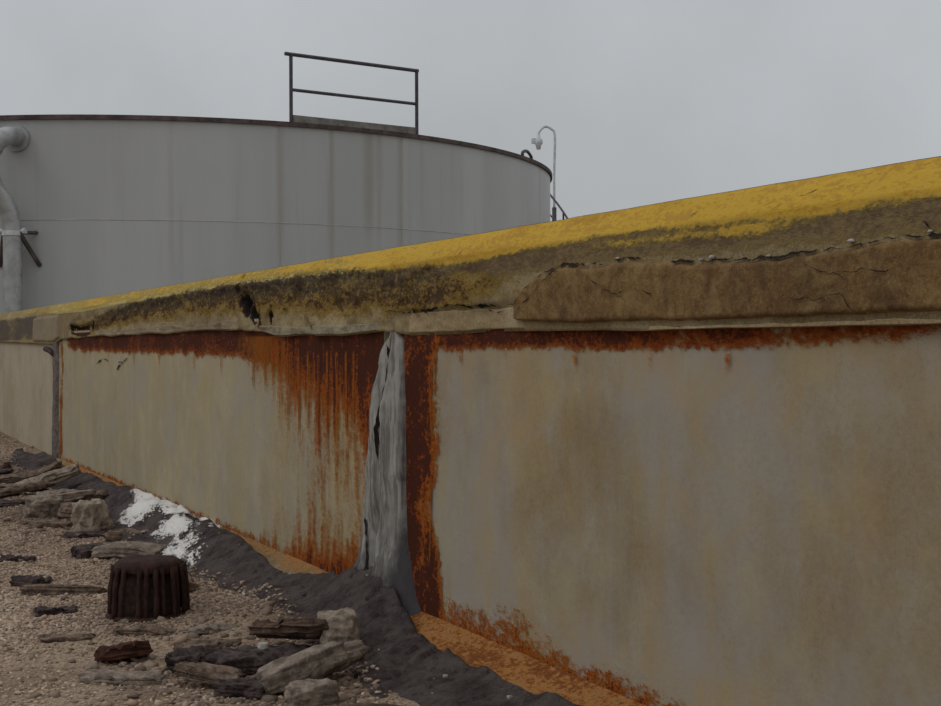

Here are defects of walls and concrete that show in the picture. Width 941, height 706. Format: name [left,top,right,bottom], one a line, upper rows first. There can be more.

water stain [90,267,456,324]
peeling [1,157,941,337]
crack [385,220,941,316]
rust [59,321,383,575]
crack [373,346,390,460]
water stain [119,489,222,565]
crack [362,518,370,570]
rust [402,324,941,706]